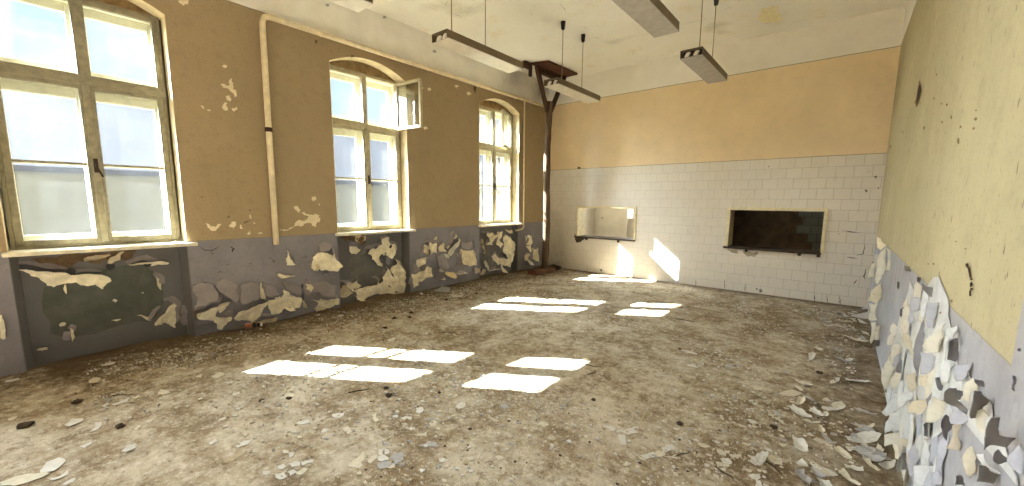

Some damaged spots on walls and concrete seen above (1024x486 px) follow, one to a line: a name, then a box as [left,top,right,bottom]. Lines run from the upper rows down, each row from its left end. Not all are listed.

peeling [201,65,237,111]
peeling [206,215,262,235]
peeling [280,196,320,231]
peeling [18,229,539,334]
peeling [59,322,77,342]
flaking render [867,237,1024,486]